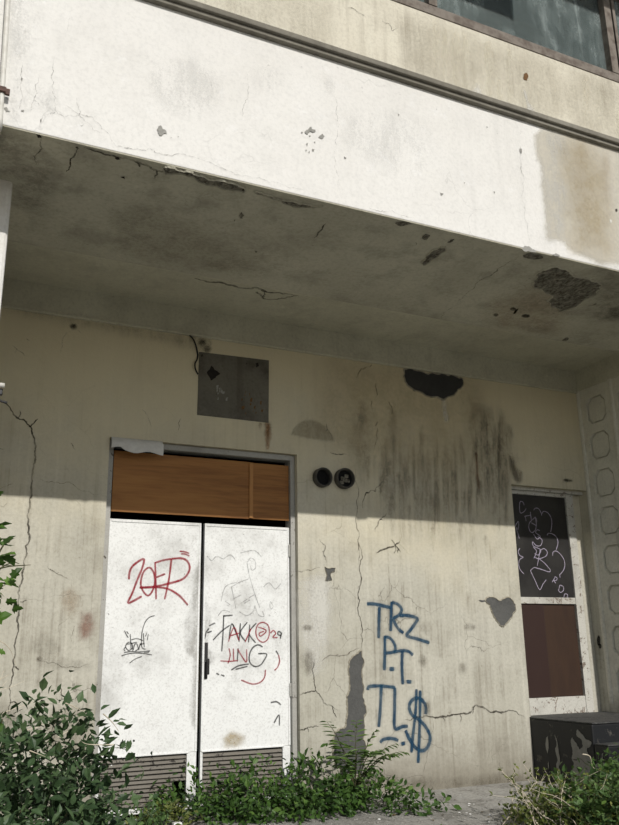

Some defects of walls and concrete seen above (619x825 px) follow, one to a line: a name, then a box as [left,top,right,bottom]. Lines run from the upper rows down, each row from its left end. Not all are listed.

water stain [537,130,619,263]
spalling [522,246,543,260]
crack [194,278,298,300]
spalling [532,253,603,312]
spalling [403,368,464,401]
crack [6,404,38,461]
crack [9,495,32,703]
crack [405,705,519,721]
peeling [546,737,561,774]
peeling [571,730,605,789]